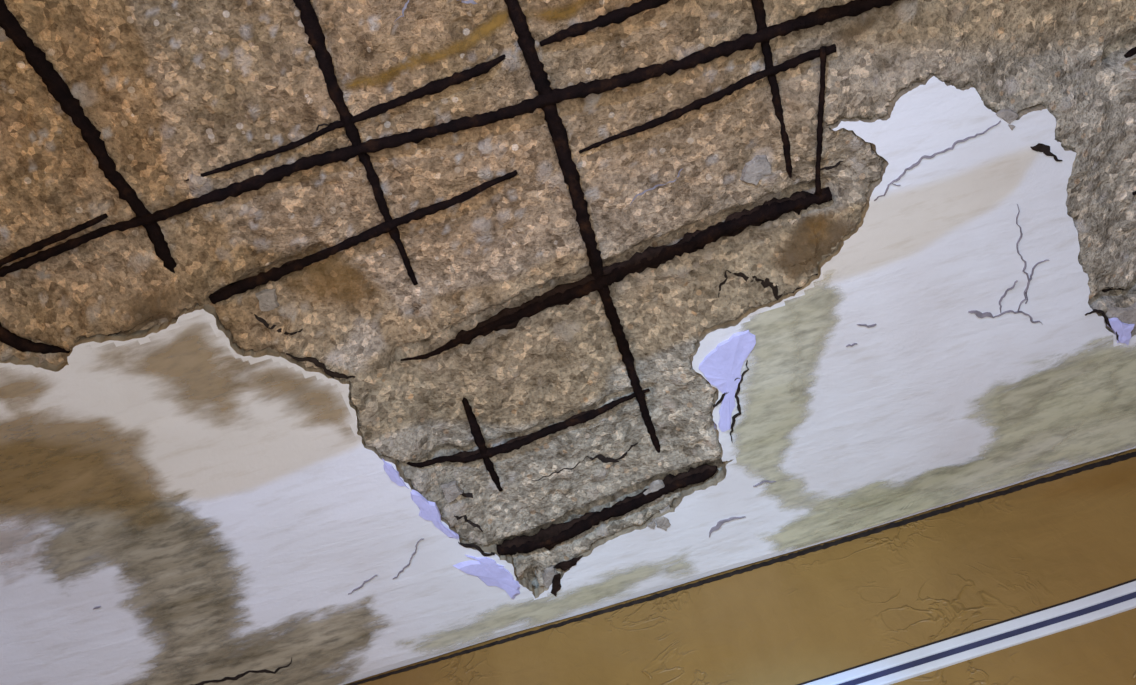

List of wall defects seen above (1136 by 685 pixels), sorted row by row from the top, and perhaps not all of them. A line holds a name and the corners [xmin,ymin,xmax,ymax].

corrosion [348,12,508,88]
corrosion [130,296,174,333]
spalling [0,0,1136,547]
corrosion [778,218,853,277]
crack [968,204,1047,323]
damp [0,380,44,401]
damp [138,329,344,422]
crack [532,443,638,481]
damp [0,413,367,685]
peeling [453,555,521,599]
spalling [496,464,718,596]
crack [348,452,1136,685]